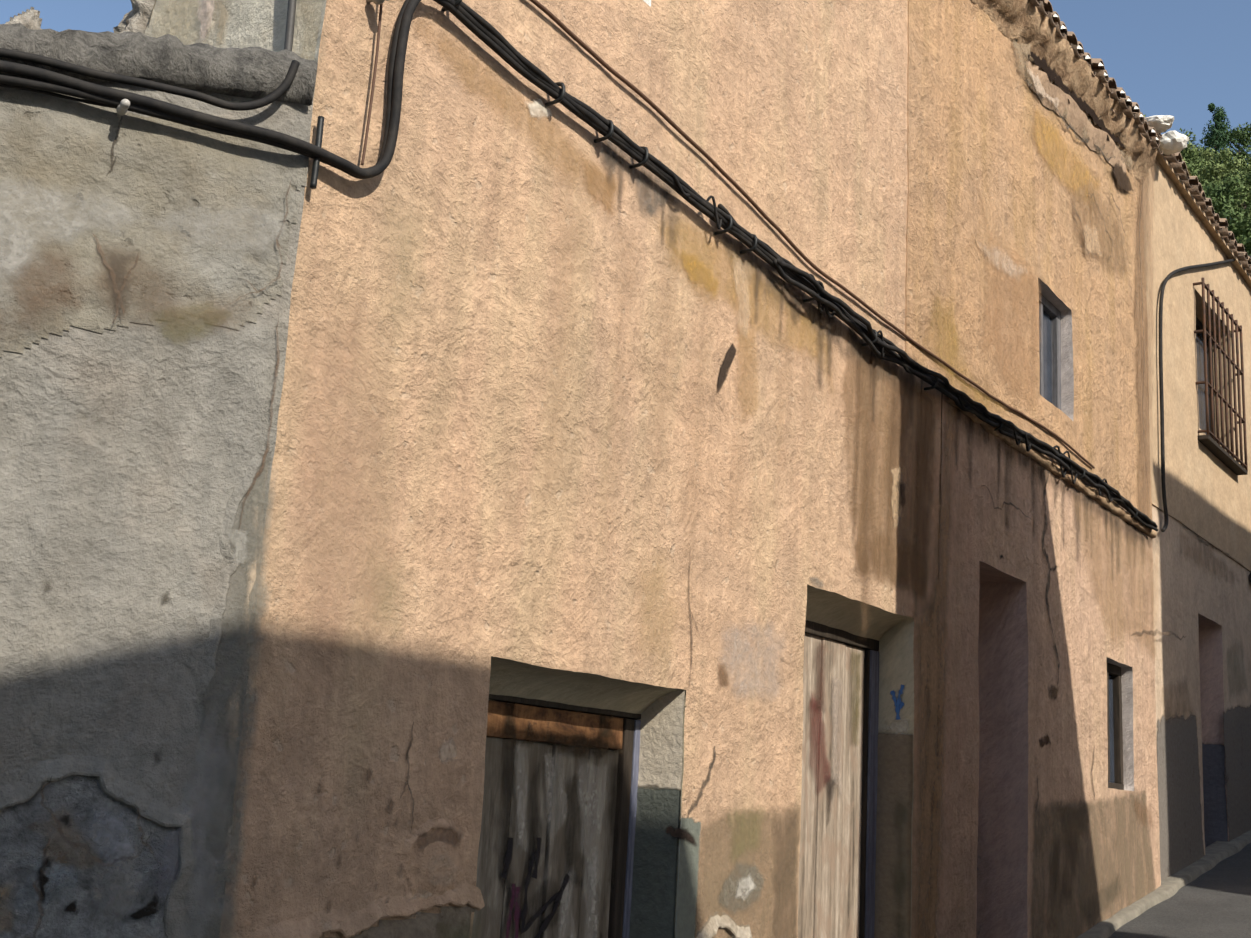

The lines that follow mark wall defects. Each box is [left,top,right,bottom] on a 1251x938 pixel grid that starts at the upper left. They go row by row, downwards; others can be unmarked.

crack [107,117,122,174]
spalling [1013,42,1154,519]
spalling [0,445,485,938]
crack [983,474,1060,685]
leakage [956,408,1159,565]
crack [1131,630,1184,640]